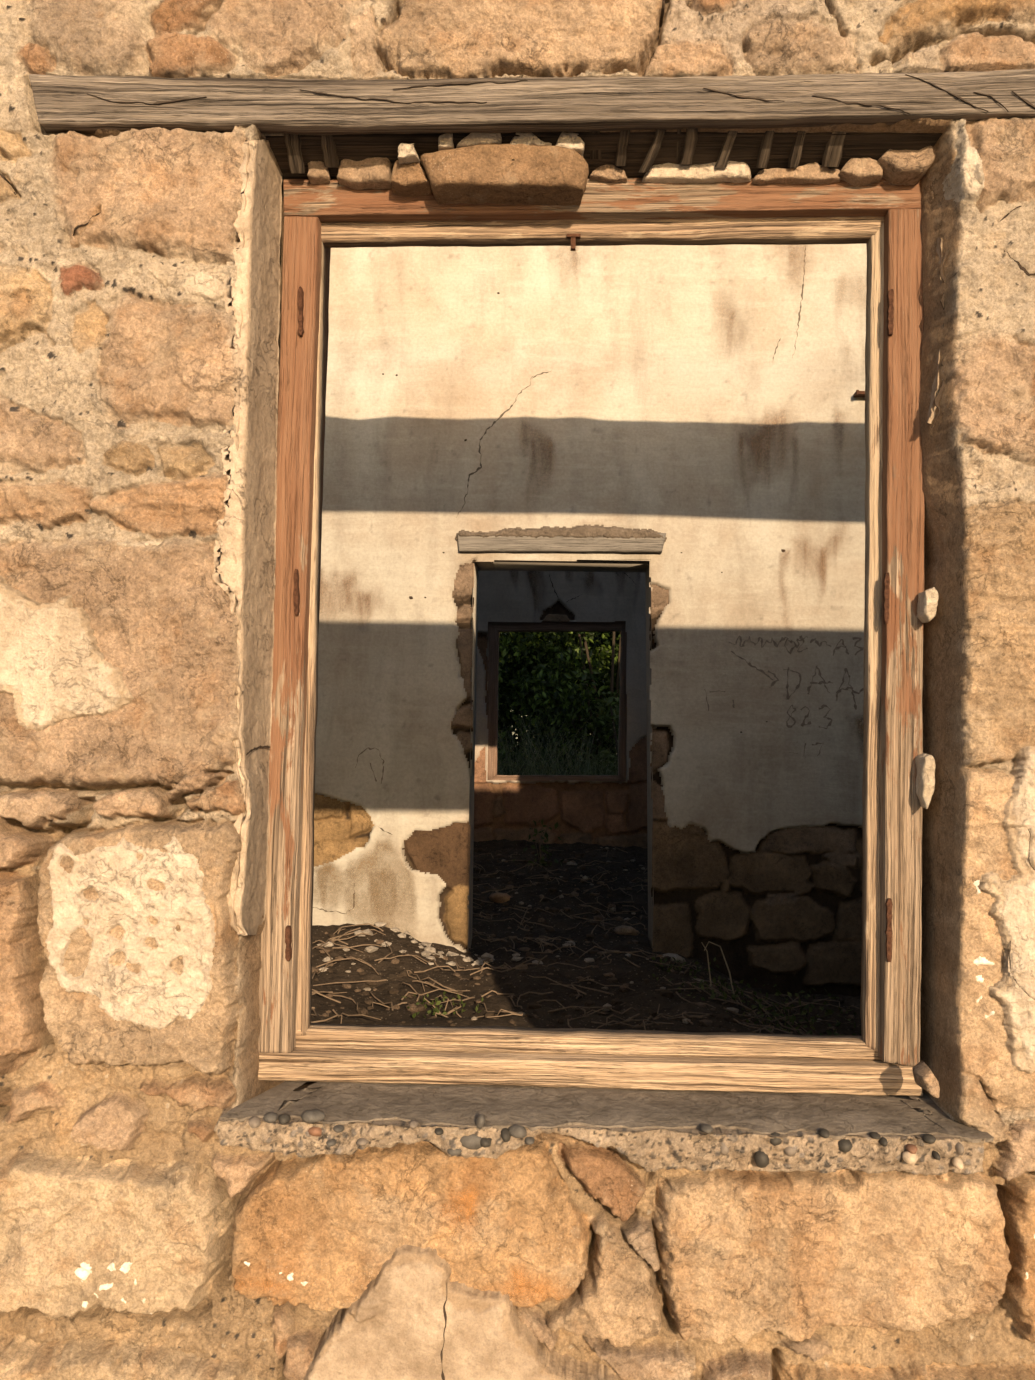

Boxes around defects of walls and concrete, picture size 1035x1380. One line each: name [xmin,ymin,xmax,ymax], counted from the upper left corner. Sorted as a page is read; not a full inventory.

crack [998,206,1035,276]
crack [458,372,548,514]
water stain [752,416,784,463]
peeling [314,793,374,867]
peeling [1015,814,1035,869]
peeling [974,950,1035,1018]